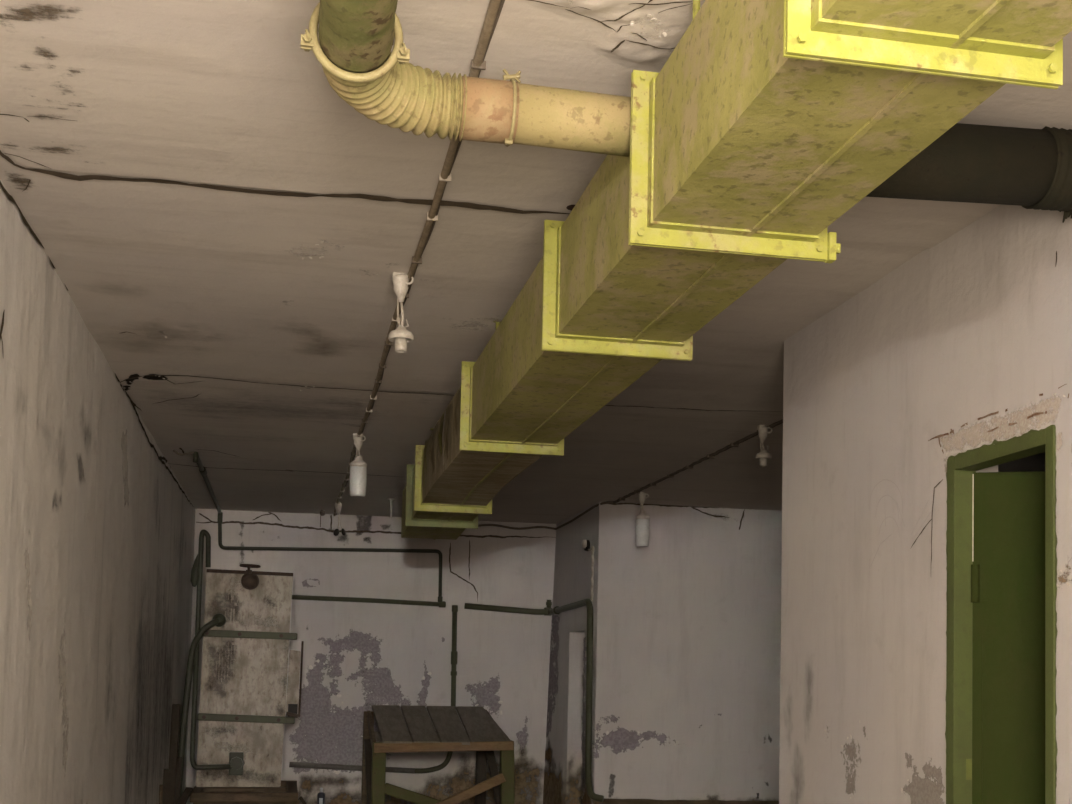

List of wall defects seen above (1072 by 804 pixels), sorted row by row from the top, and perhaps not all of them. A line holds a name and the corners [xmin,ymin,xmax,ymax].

water stain [0,4,75,21]
crack [0,150,570,290]
crack [115,374,454,534]
crack [449,535,556,601]
peeling [289,629,432,774]
peeling [465,675,503,715]
peeling [546,614,560,738]
peeling [581,637,679,791]
peeling [840,721,866,799]
peeling [901,753,944,804]